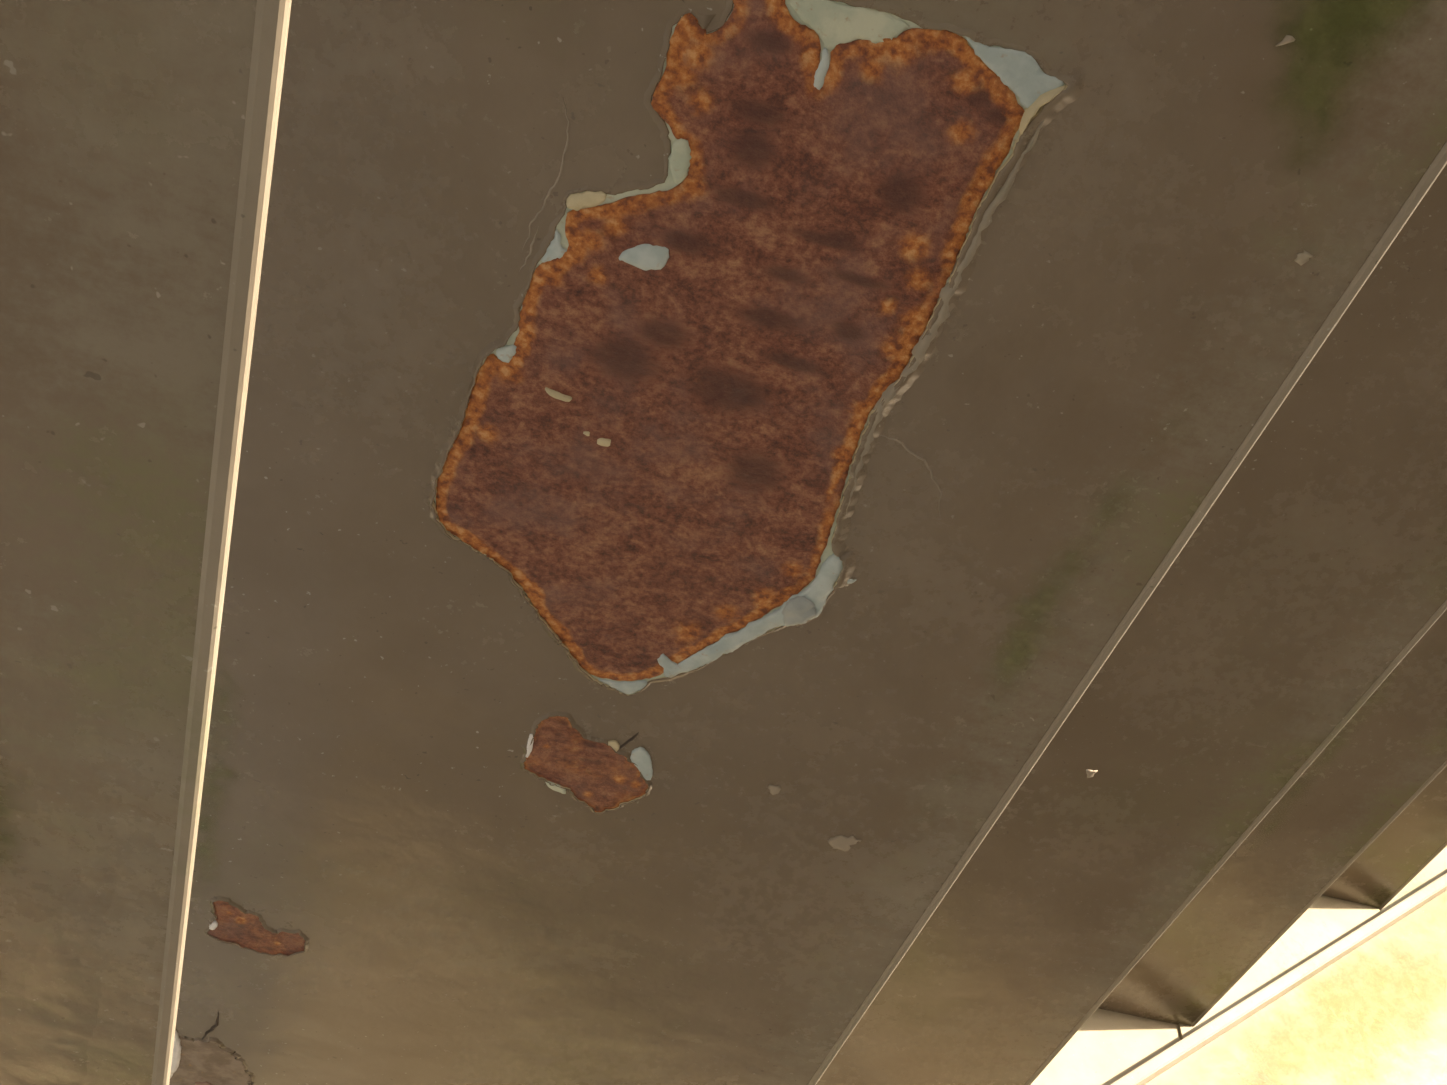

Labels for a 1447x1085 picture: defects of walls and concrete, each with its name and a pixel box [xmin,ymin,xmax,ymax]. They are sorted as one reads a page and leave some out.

rust [427,0,1086,696]
rust [520,711,653,814]
rust [204,896,309,957]
peeling [169,1011,255,1085]